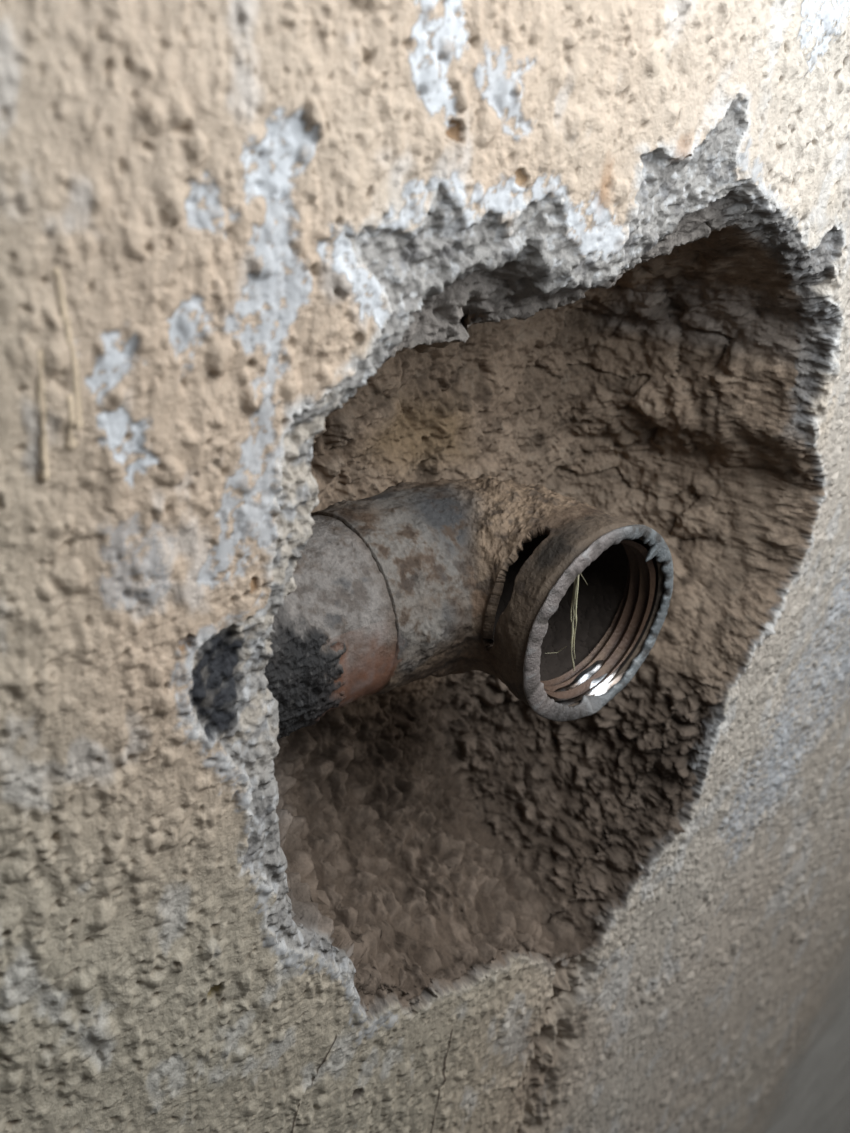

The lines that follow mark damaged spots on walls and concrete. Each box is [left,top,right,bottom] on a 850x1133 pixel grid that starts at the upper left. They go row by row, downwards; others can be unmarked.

spalling [177,93,844,1026]